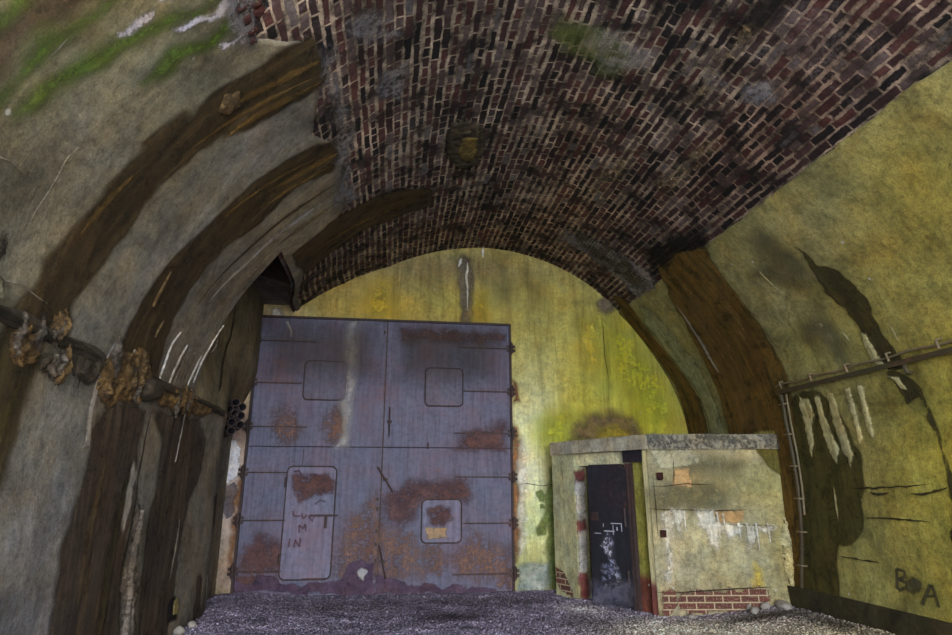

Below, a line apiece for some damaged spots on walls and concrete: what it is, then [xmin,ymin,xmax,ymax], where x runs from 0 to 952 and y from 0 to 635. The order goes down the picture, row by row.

damp [0,0,83,75]
damp [0,34,326,485]
damp [49,141,433,635]
corrosion [401,329,505,345]
damp [458,255,482,322]
damp [597,248,874,596]
damp [751,233,952,508]
corrosion [228,479,281,576]
corrosion [292,474,335,502]
corrosion [333,479,471,578]
corrosion [458,423,521,563]
spalling [662,585,771,617]